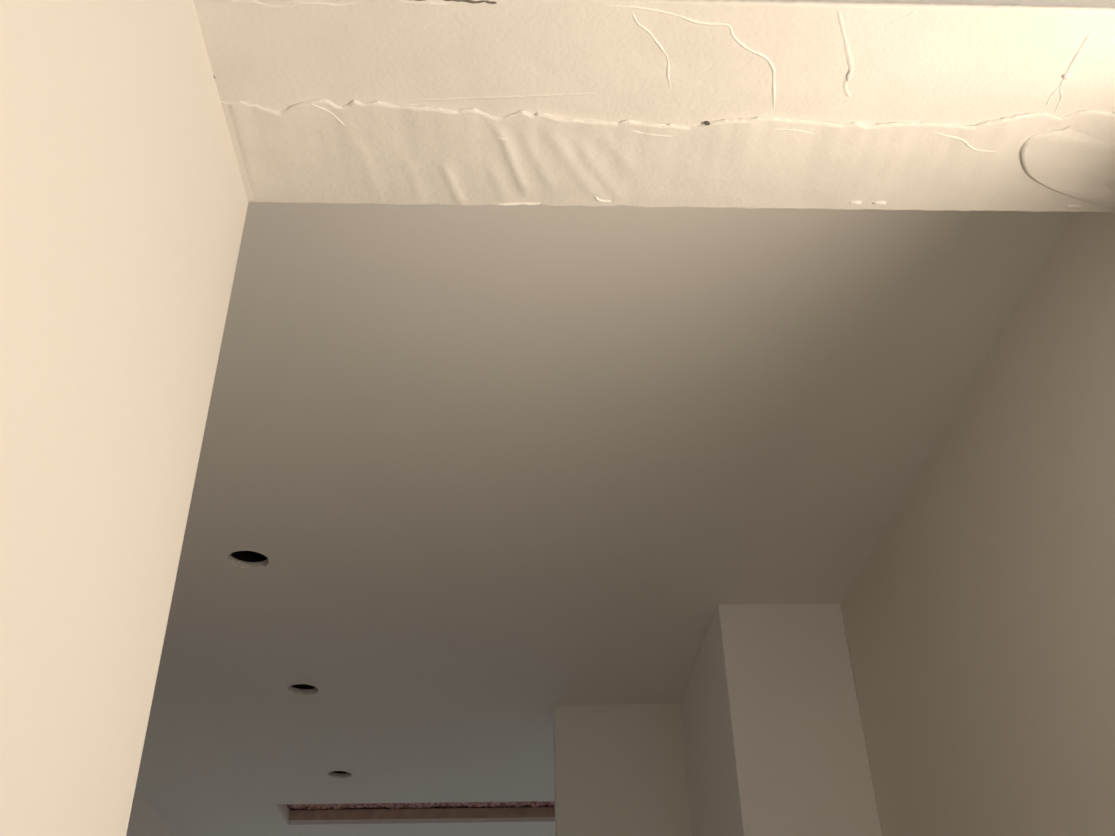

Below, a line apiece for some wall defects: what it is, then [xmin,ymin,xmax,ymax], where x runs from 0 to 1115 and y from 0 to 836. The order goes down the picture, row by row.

crack [221,5,1115,152]